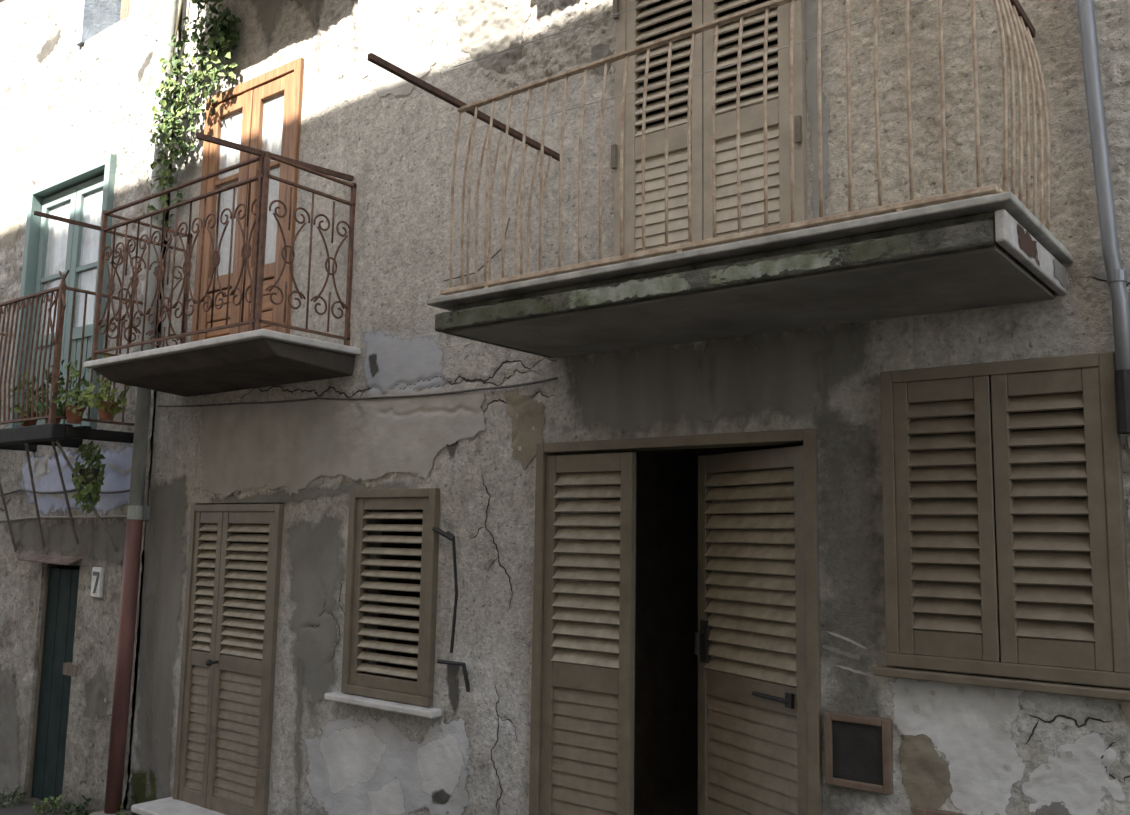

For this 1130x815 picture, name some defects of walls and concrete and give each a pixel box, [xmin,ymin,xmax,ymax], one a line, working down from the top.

corrosion [1018,224,1040,265]
peeling [199,387,486,499]
spalling [369,354,379,377]
crack [232,358,558,412]
spalling [504,390,545,470]
crack [471,475,513,609]
peeling [305,713,474,815]
crack [491,680,518,813]
peeling [887,678,1126,815]